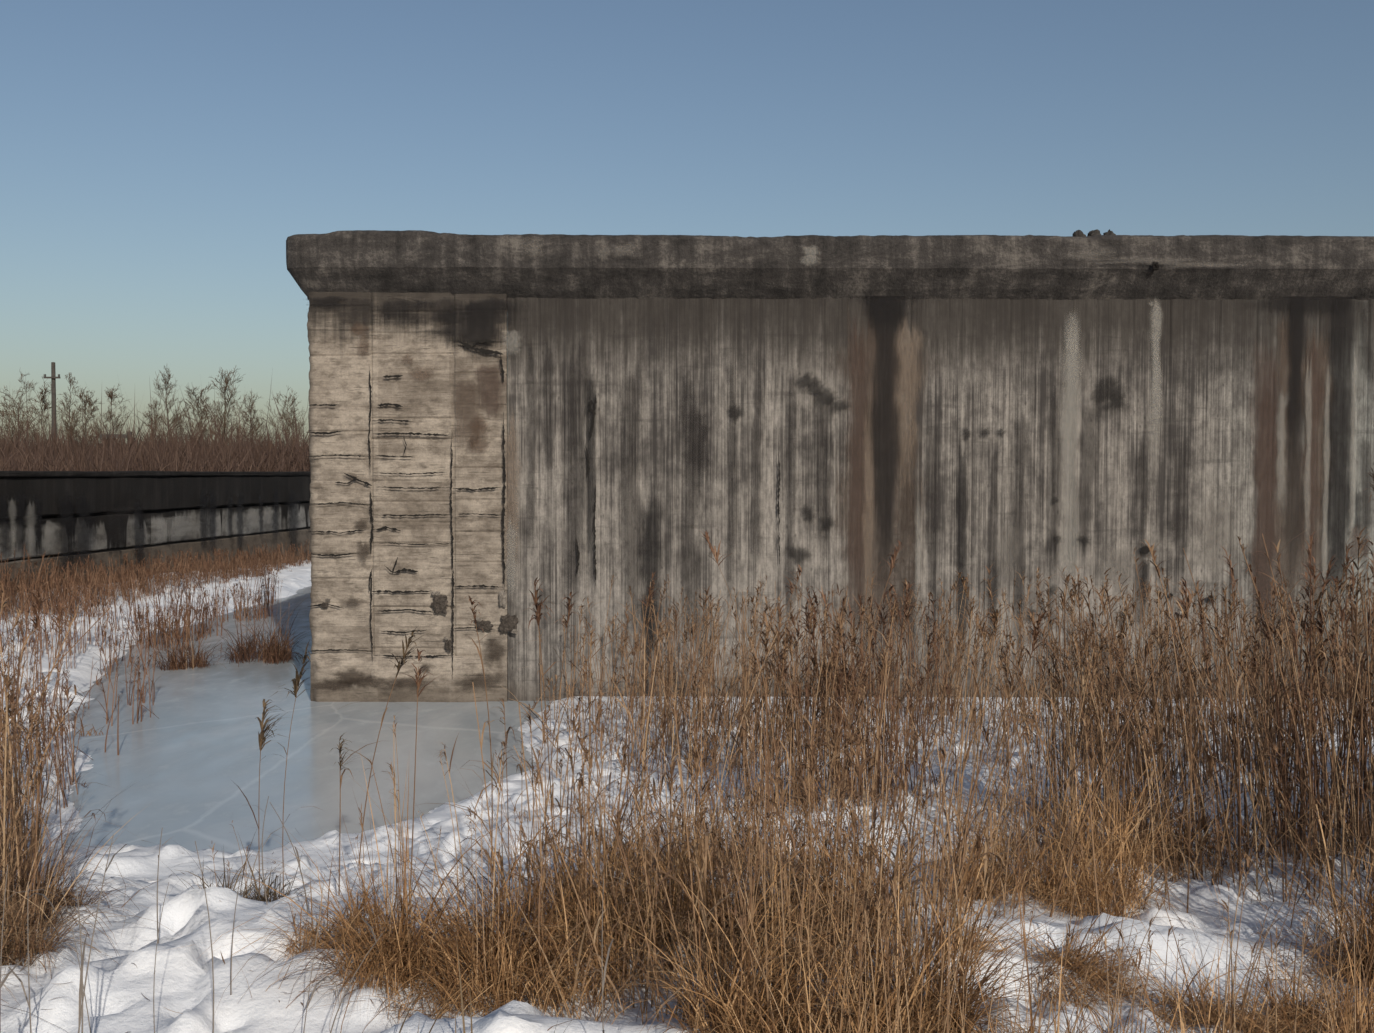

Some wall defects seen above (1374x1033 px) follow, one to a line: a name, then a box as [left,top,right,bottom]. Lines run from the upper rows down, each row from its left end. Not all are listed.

water stain [0,494,94,571]
water stain [200,489,299,551]
water stain [383,298,427,325]
crack [307,339,506,679]
water stain [439,298,516,346]
water stain [587,381,596,569]
water stain [642,494,661,644]
water stain [798,373,848,410]
rust [841,296,917,633]
water stain [957,428,1005,636]
rust [1272,326,1332,608]
water stain [1270,296,1352,579]